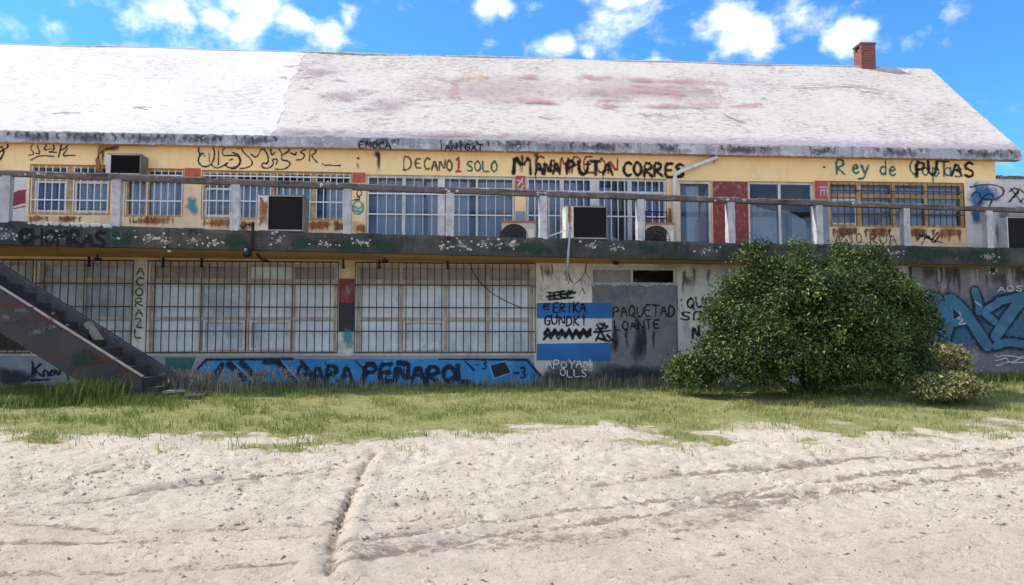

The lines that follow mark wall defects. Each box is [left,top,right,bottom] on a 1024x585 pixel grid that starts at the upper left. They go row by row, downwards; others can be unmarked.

corrosion [203,197,267,230]
water stain [613,318,655,347]